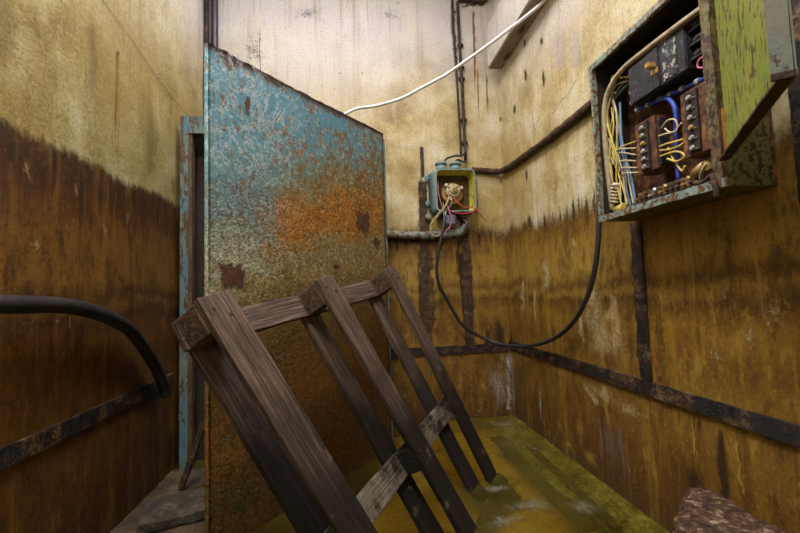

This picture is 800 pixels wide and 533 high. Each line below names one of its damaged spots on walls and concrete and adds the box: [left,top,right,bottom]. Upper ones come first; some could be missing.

corrosion [451,3,488,108]
corrosion [388,239,446,326]
damp [388,126,800,533]